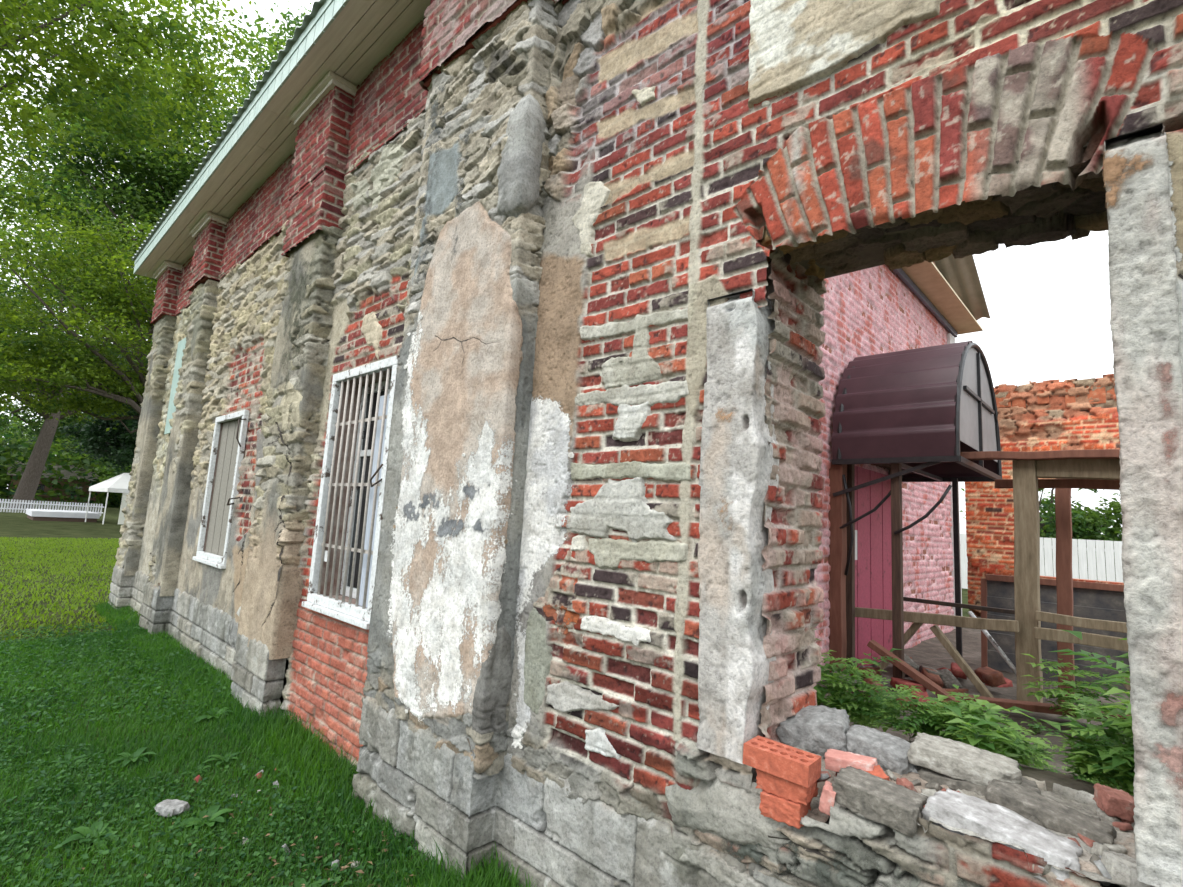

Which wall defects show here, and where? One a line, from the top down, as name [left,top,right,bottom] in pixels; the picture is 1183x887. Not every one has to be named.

crack [435,335,493,364]
crack [233,422,292,632]
peeling [387,202,693,749]
peeling [585,727,622,760]